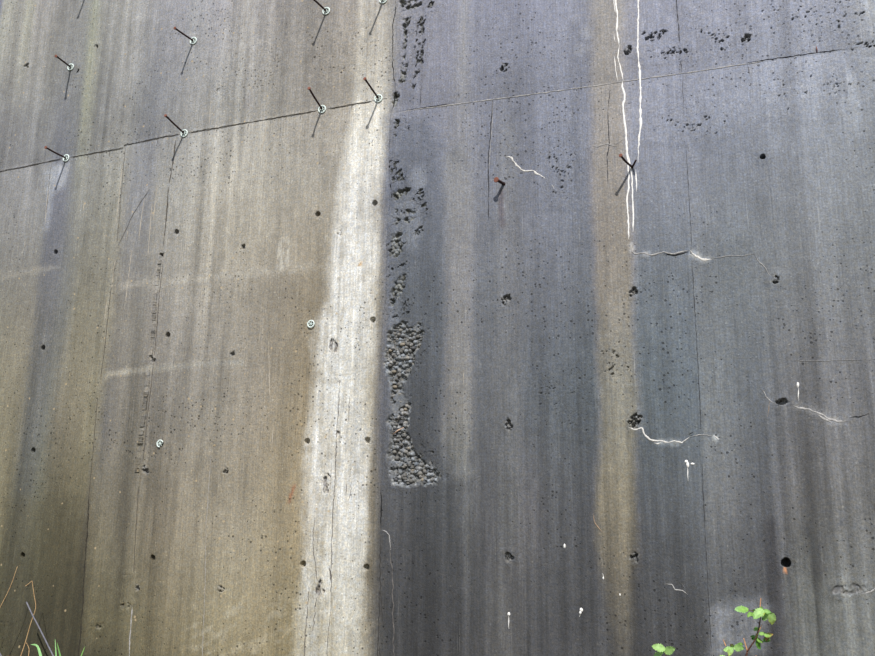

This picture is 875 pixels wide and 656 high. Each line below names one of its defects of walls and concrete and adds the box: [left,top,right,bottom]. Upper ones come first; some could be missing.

spalling [630,0,875,127]
spalling [379,0,447,331]
crack [505,143,554,188]
spalling [529,113,597,216]
damp [569,0,652,335]
crack [629,242,772,277]
damp [436,119,524,555]
crack [629,427,719,445]
damp [789,387,851,430]
crack [794,406,864,423]
damp [587,389,683,656]
damp [703,515,790,656]